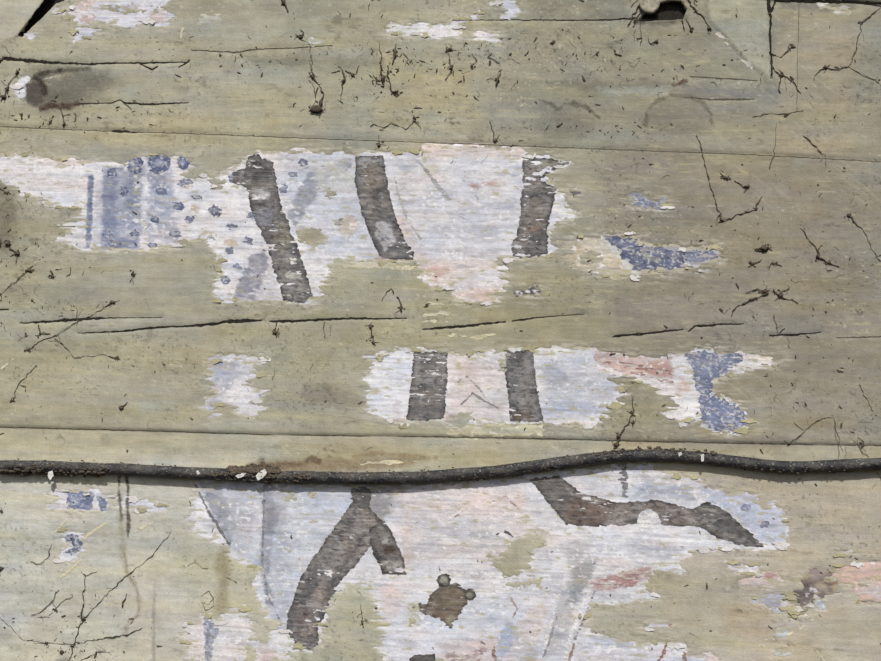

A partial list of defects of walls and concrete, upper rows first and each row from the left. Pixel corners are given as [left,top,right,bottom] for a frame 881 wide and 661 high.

crack [18,0,64,36]
peeling [52,0,175,44]
crack [3,45,333,70]
leakage [25,68,109,110]
peeling [0,143,724,323]
crack [0,309,576,333]
crack [612,323,744,337]
crack [769,328,881,338]
peeling [200,353,271,418]
peeling [360,333,773,440]
peeling [177,461,881,661]